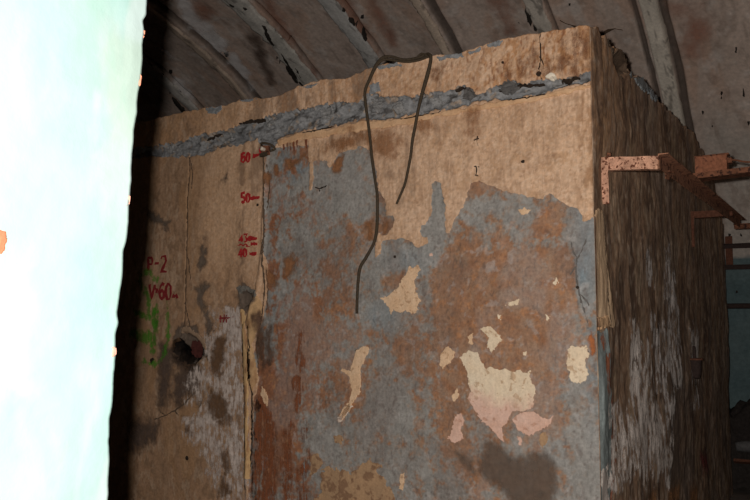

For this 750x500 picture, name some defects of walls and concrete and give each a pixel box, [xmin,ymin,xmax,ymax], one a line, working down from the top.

crack [181,157,193,334]
water stain [197,245,207,270]
crack [260,157,270,317]
peeling [132,71,615,500]
water stain [158,282,273,500]
corrosion [253,396,310,500]
corrosion [292,331,305,412]
water stain [480,443,555,500]